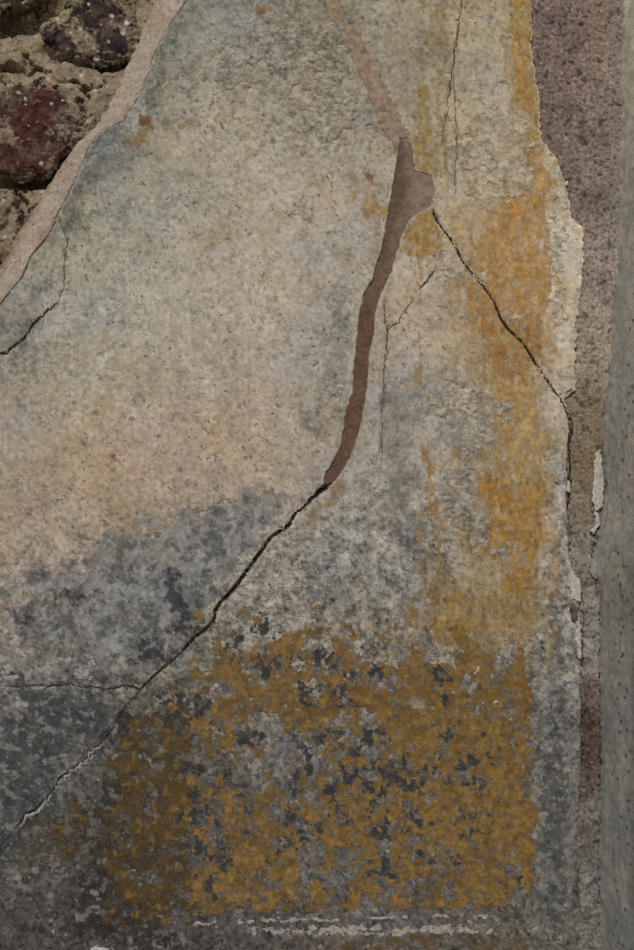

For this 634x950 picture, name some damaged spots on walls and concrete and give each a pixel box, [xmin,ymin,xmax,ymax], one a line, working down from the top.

crack [0,0,602,761]
crack [0,726,115,850]
crack [595,746,603,949]